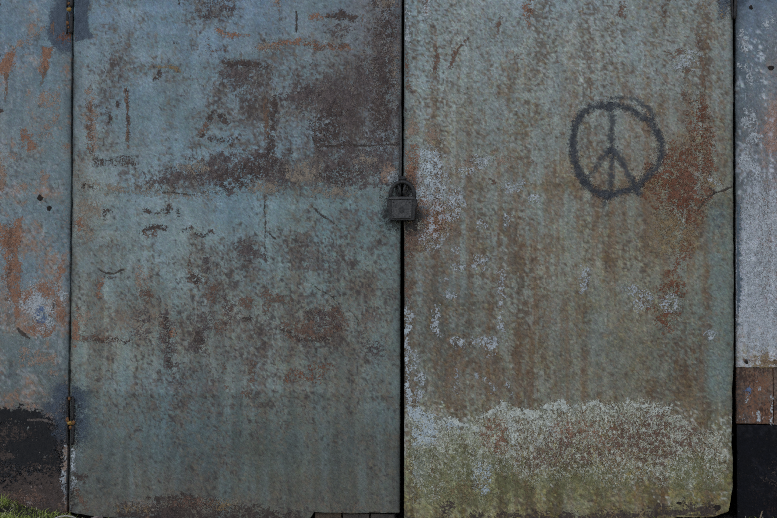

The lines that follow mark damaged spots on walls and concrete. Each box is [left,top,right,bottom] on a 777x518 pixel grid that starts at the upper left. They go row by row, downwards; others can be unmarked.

corrosion [0,26,45,100]
corrosion [0,46,61,194]
corrosion [73,0,412,242]
corrosion [433,37,469,74]
corrosion [639,18,723,337]
corrosion [0,216,186,388]
corrosion [187,252,292,354]
corrosion [278,307,349,344]